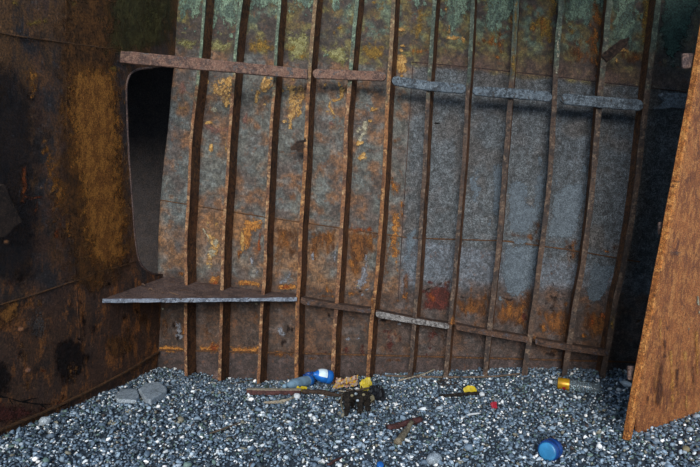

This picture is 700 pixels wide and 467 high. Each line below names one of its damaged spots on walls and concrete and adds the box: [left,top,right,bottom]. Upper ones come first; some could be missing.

corrosion [207,76,232,112]
corrosion [251,77,273,105]
corrosion [282,79,305,129]
corrosion [61,66,129,269]
corrosion [202,221,220,268]
corrosion [238,218,263,258]
corrosion [349,227,376,275]
corrosion [423,278,450,310]
corrosion [497,294,530,326]
leakage [54,314,96,399]